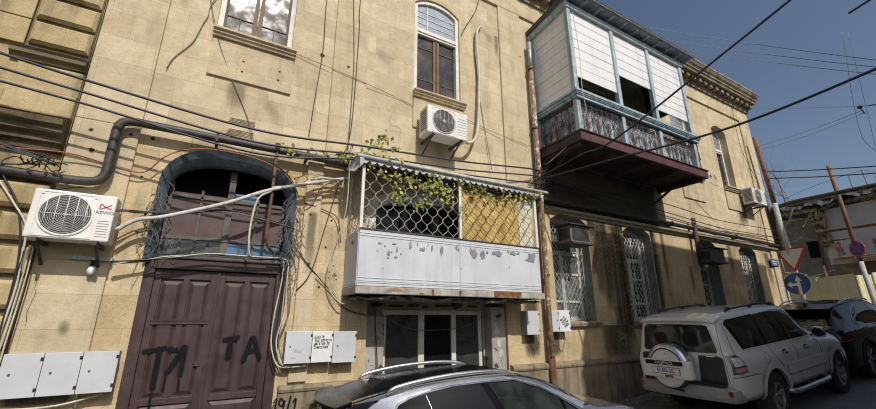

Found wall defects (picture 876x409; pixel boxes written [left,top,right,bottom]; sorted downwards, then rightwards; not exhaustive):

peeling [377,241,443,258]
peeling [470,247,536,262]
leakage [588,221,635,355]